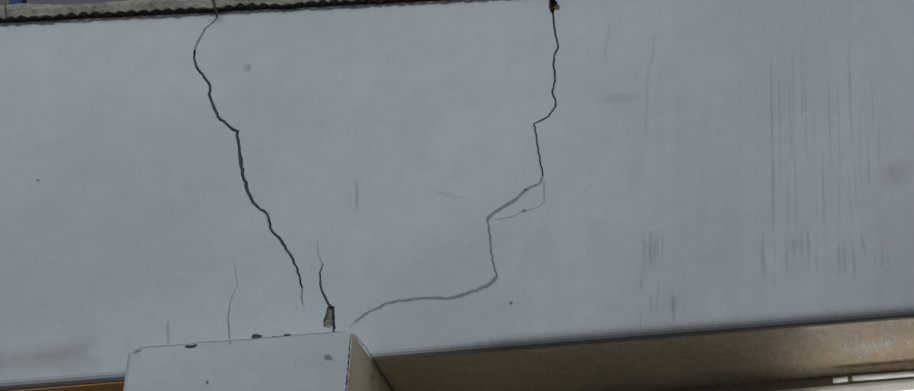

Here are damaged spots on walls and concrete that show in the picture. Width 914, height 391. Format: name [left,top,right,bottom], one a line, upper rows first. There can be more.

crack [193,51,335,333]
crack [533,11,559,176]